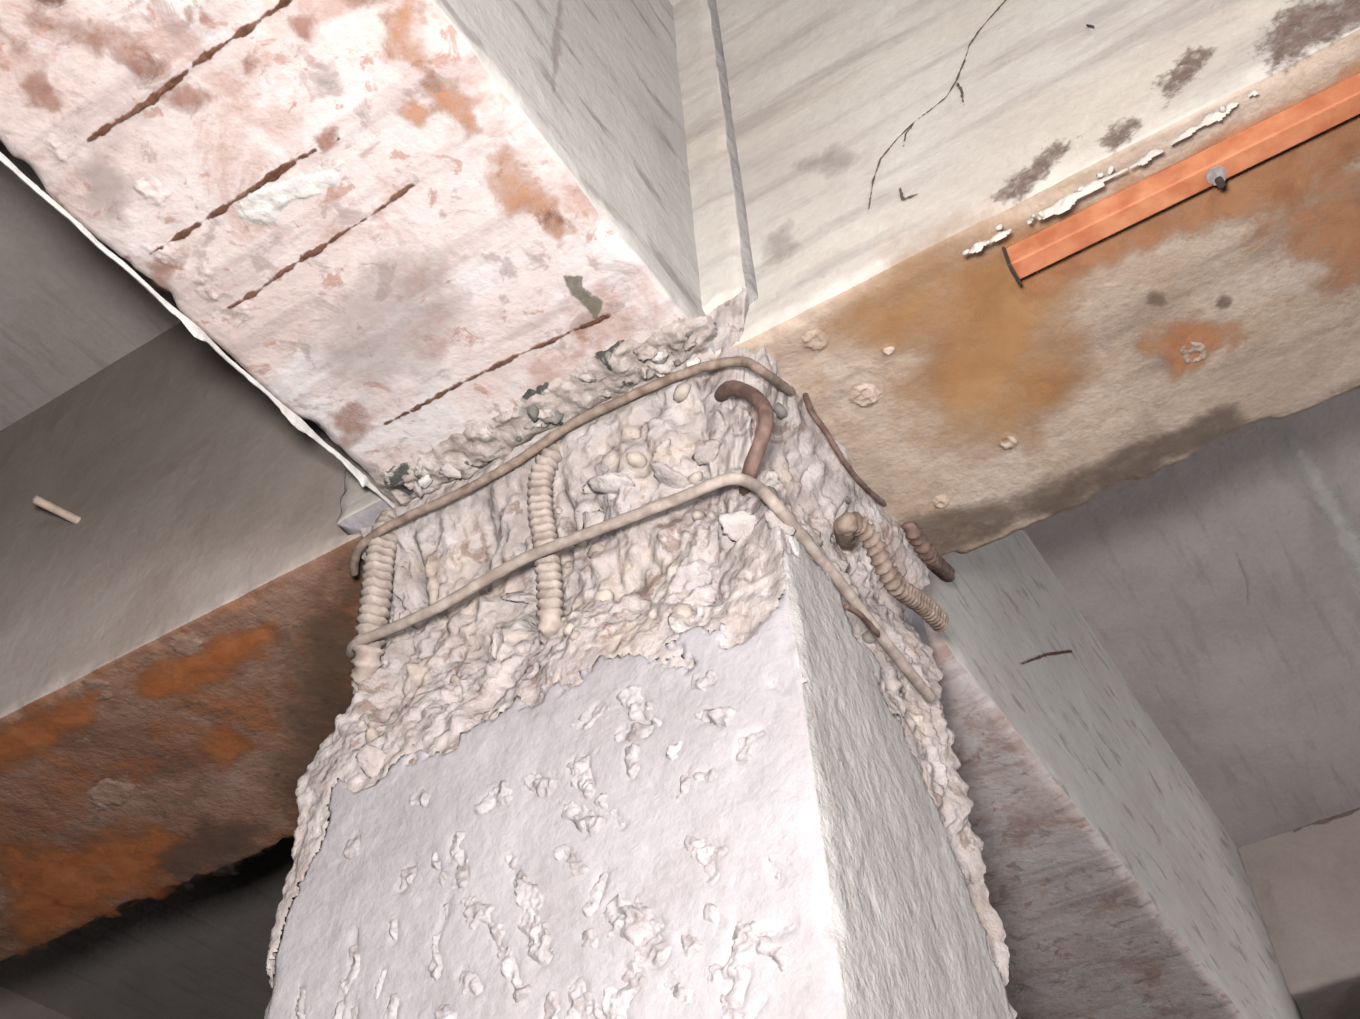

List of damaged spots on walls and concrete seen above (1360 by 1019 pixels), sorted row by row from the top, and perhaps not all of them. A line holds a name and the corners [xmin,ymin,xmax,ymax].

crack [87,0,291,141]
crack [150,138,340,254]
crack [227,184,414,309]
rust [317,128,335,150]
rust [402,75,476,130]
crack [868,0,1006,209]
damp [995,143,1068,200]
rust [854,114,1360,430]
damp [1101,119,1140,148]
damp [1265,0,1360,65]
spalling [0,152,1012,988]
spalling [295,982,306,1019]